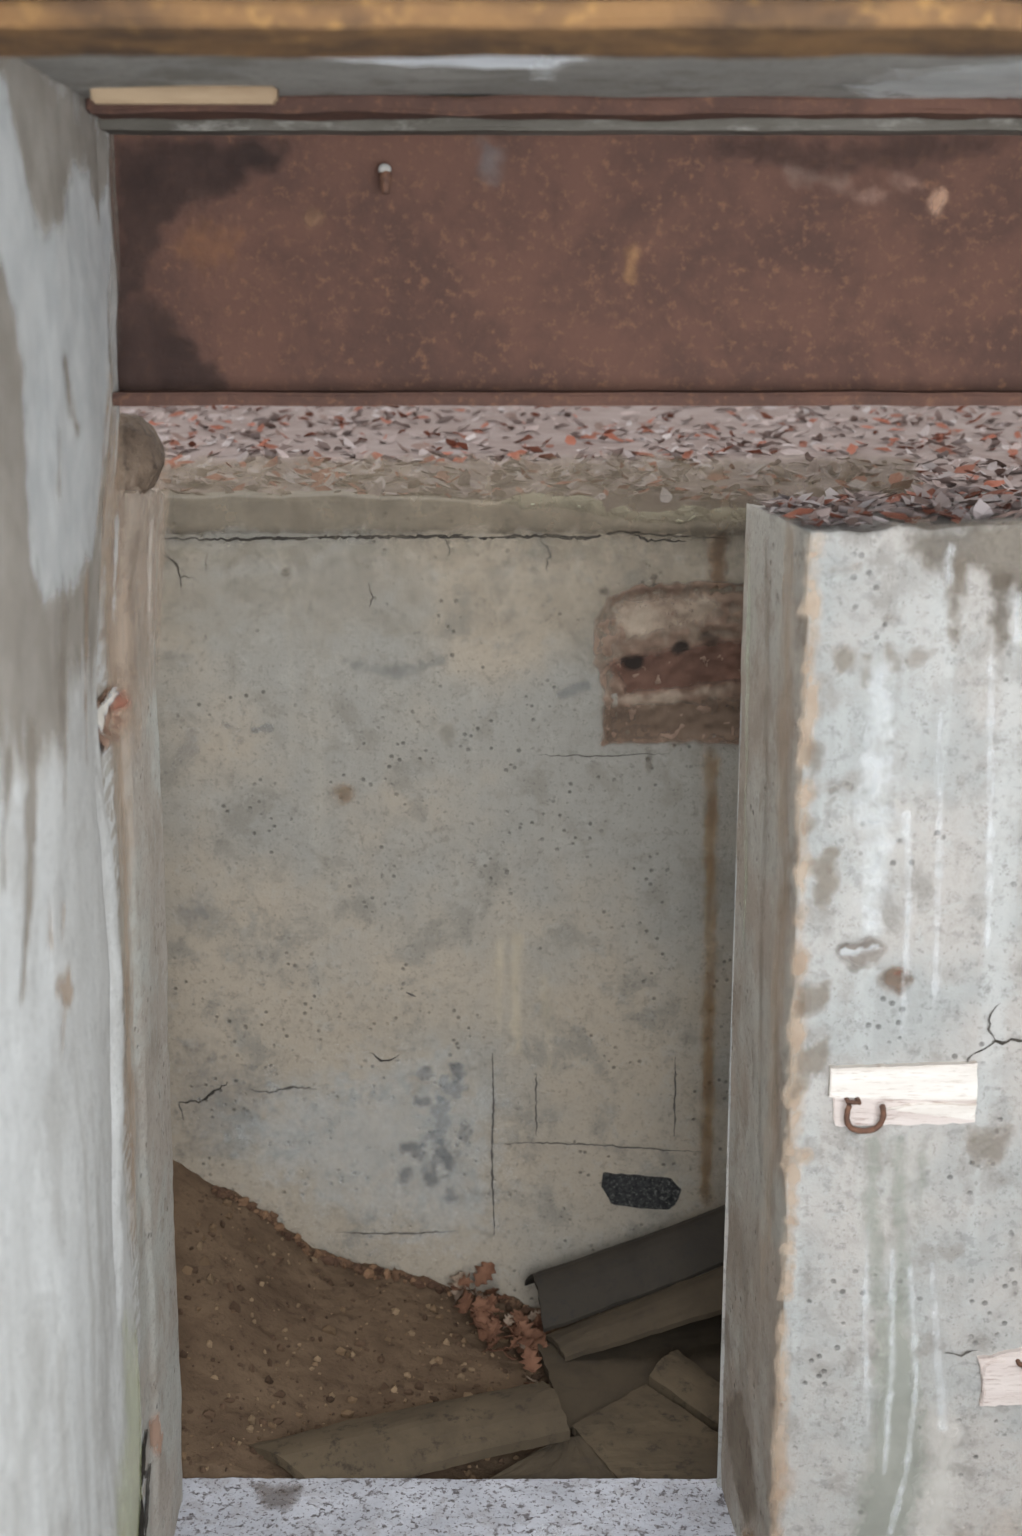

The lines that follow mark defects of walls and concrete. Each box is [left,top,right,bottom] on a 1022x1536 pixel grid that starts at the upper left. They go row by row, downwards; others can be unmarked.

corrosion [116,141,287,390]
spalling [593,576,744,746]
damp [914,524,1022,643]
crack [967,1004,1022,1062]